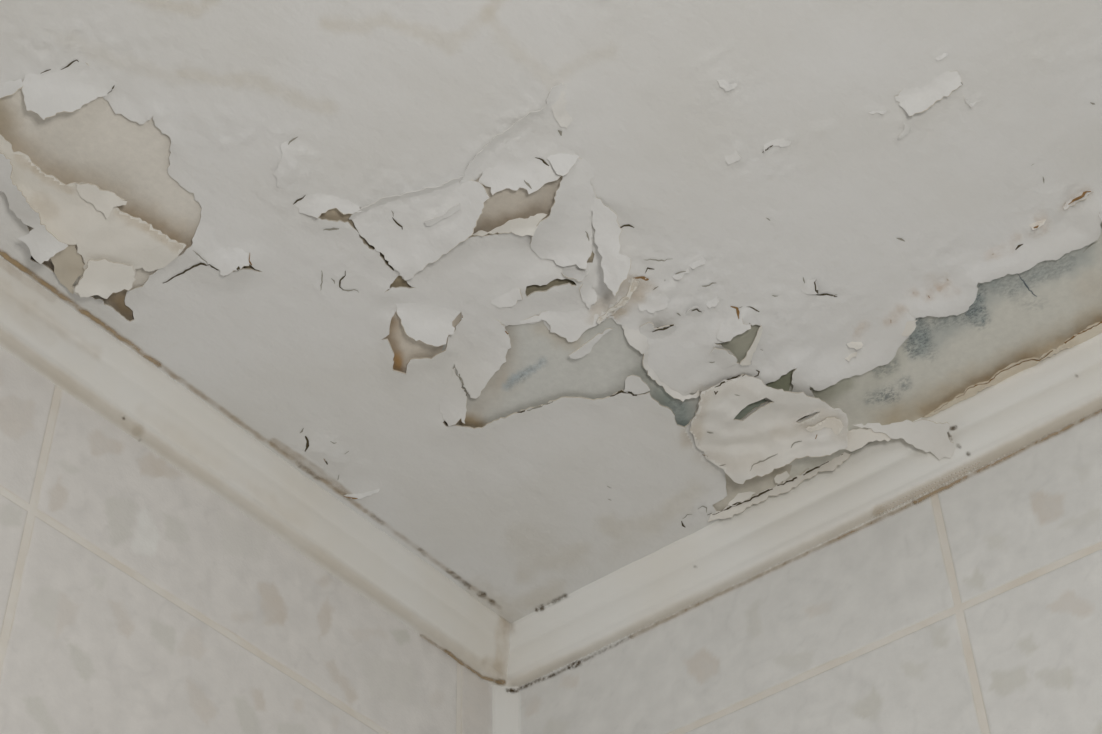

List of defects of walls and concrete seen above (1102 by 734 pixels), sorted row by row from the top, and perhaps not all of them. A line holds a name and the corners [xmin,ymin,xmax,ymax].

peeling [0,62,259,321]
peeling [294,83,1102,522]
peeling [895,53,980,139]
damp [905,449,1023,507]